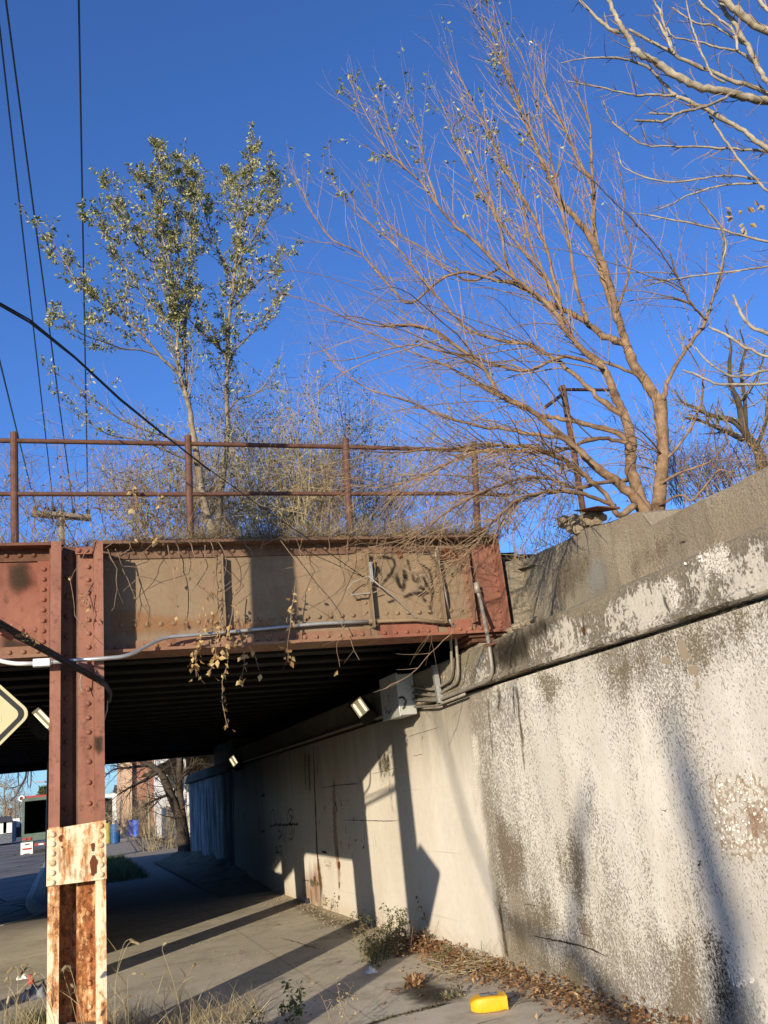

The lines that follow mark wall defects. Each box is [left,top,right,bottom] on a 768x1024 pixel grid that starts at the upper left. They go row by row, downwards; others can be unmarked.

corrosion [10,563,29,590]
damp [470,693,500,812]
damp [513,687,525,771]
peeling [709,771,768,861]
corrosion [89,843,97,876]
crack [532,933,613,969]